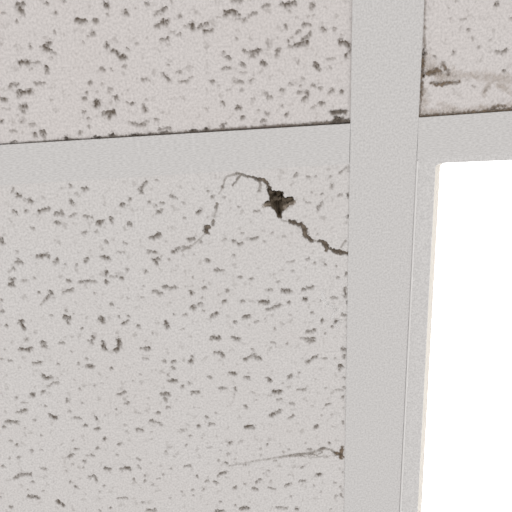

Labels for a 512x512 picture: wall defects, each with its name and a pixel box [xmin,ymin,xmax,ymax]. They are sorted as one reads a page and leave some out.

crack [236,173,272,194]
crack [288,220,348,255]